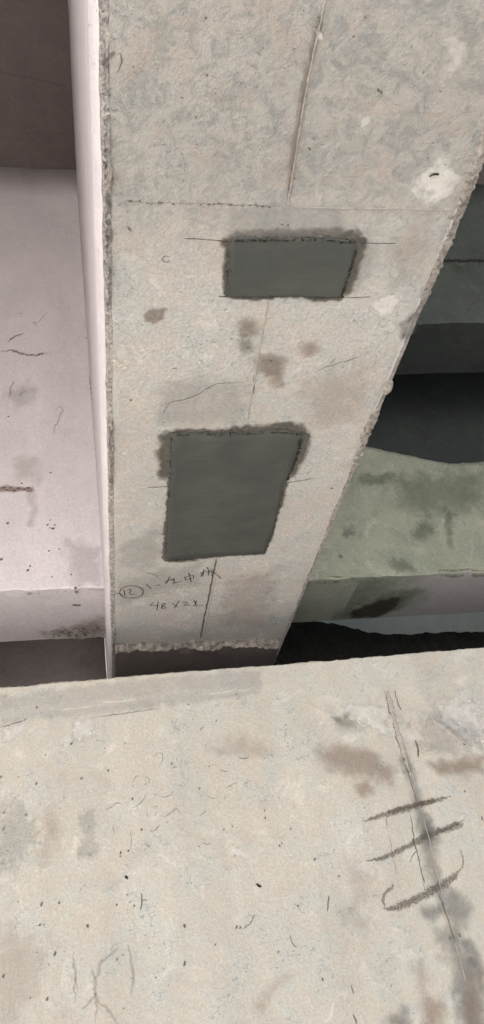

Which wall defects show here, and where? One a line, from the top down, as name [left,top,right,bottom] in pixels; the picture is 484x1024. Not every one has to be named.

spalling [372,128,484,381]
spalling [273,394,385,664]
crack [386,809,425,891]